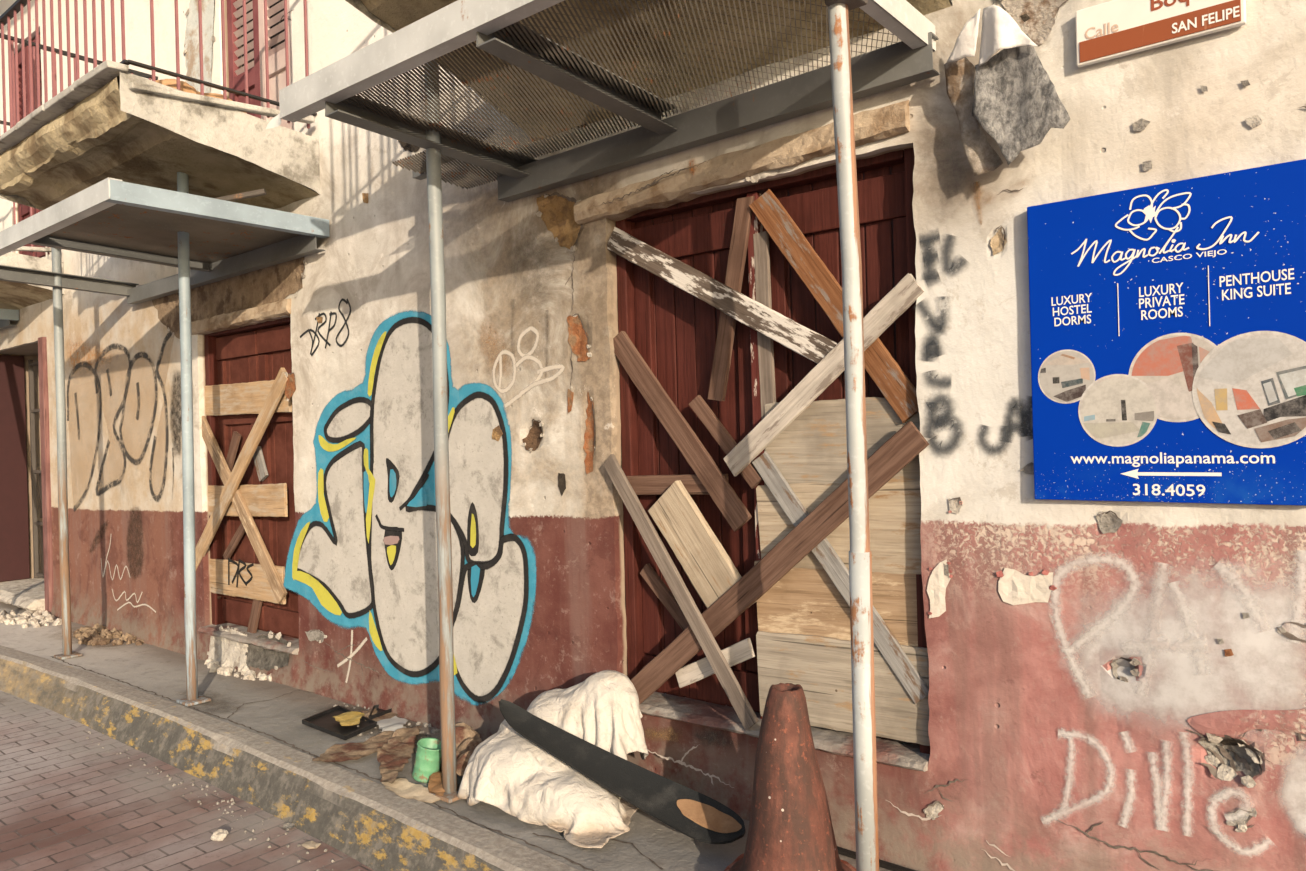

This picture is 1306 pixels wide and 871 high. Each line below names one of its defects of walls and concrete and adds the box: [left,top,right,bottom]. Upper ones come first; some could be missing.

spalling [999,0,1068,45]
spalling [536,192,583,252]
spalling [567,313,592,362]
spalling [522,419,544,453]
spalling [1096,511,1123,534]
spalling [1276,622,1306,642]
spalling [1198,733,1263,788]
crack [1045,815,1255,871]